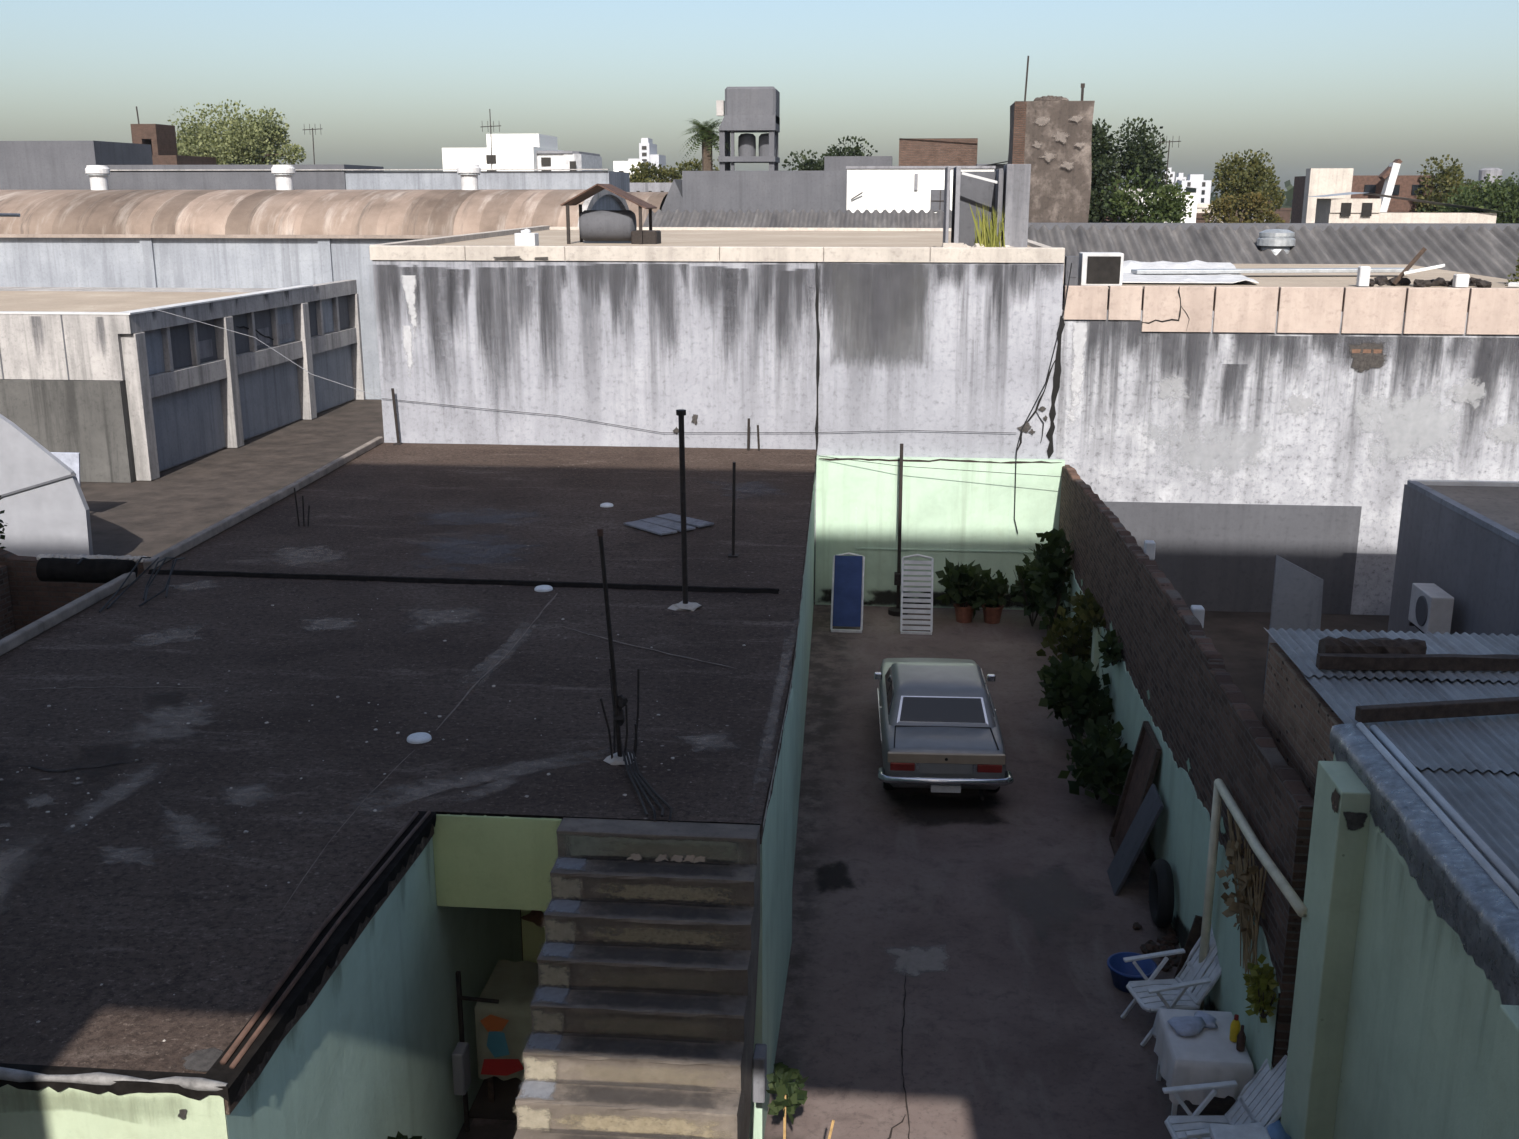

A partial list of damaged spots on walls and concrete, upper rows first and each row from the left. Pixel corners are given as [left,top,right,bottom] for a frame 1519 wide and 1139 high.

damp [377,262,1060,369]
damp [1067,321,1219,422]
spalling [1349,342,1385,373]
damp [1223,333,1519,396]
spalling [1331,788,1368,830]
crack [887,975,910,1139]